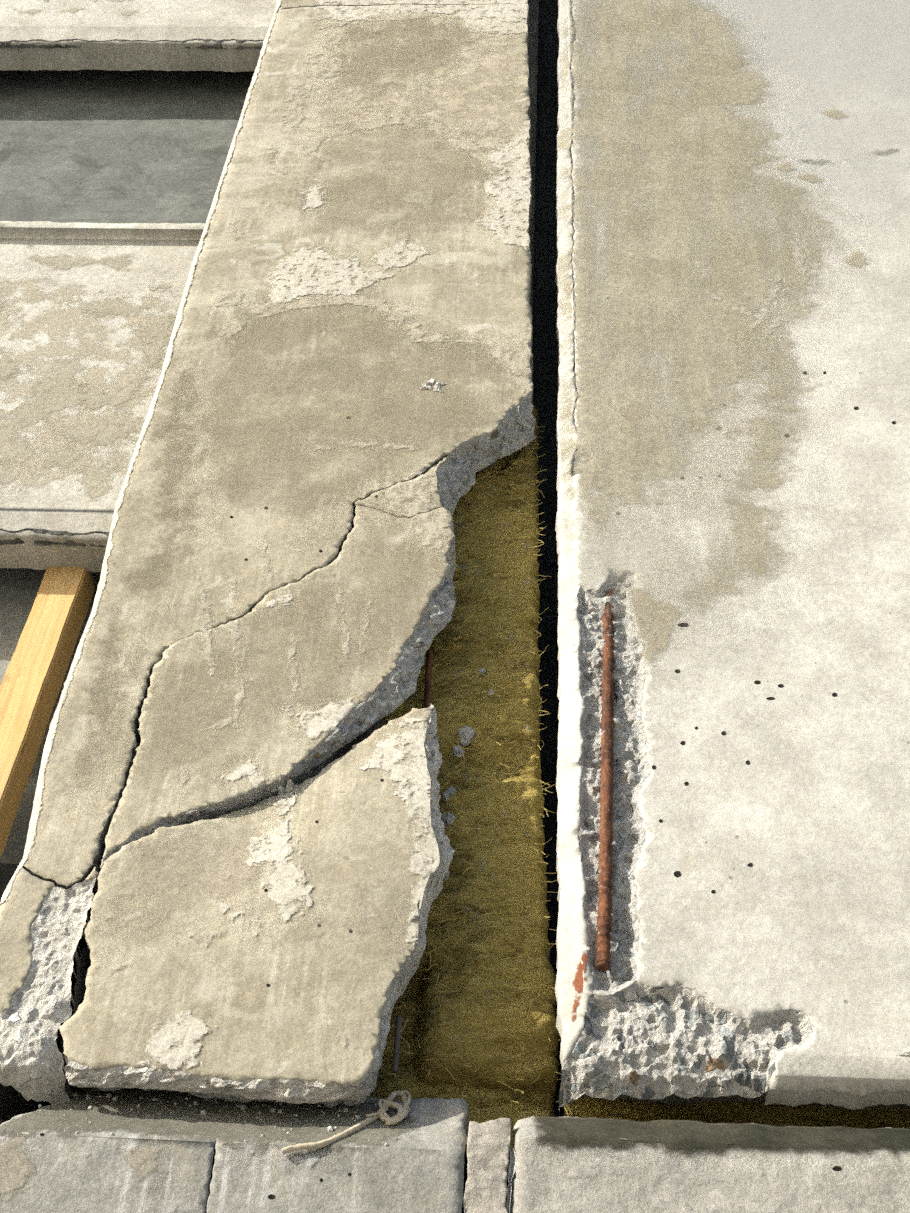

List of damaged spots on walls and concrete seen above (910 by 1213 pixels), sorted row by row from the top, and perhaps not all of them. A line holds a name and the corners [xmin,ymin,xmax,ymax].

damp [823,110,845,119]
damp [558,0,821,603]
damp [846,251,866,266]
crack [218,455,446,627]
spalling [380,392,536,548]
damp [628,588,679,659]
crack [22,565,456,890]
spalling [0,704,455,1105]
spalling [559,570,815,1108]